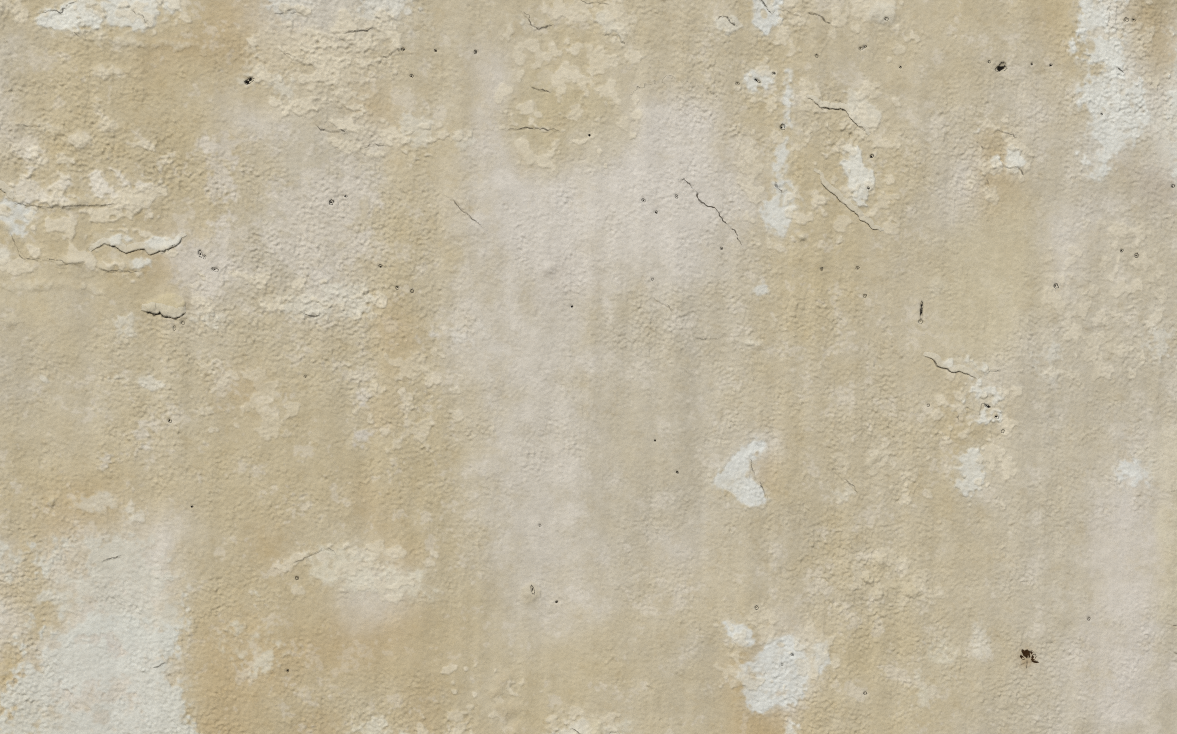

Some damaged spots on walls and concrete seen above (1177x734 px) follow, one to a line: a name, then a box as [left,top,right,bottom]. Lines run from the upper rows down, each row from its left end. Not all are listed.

crack [88,233,187,255]
spalling [0,0,478,337]
peeling [706,0,907,255]
crack [814,168,884,231]
spalling [105,304,159,353]
peeling [344,343,465,458]
peeling [703,429,774,516]
peeling [0,358,447,734]
peeling [711,598,843,734]